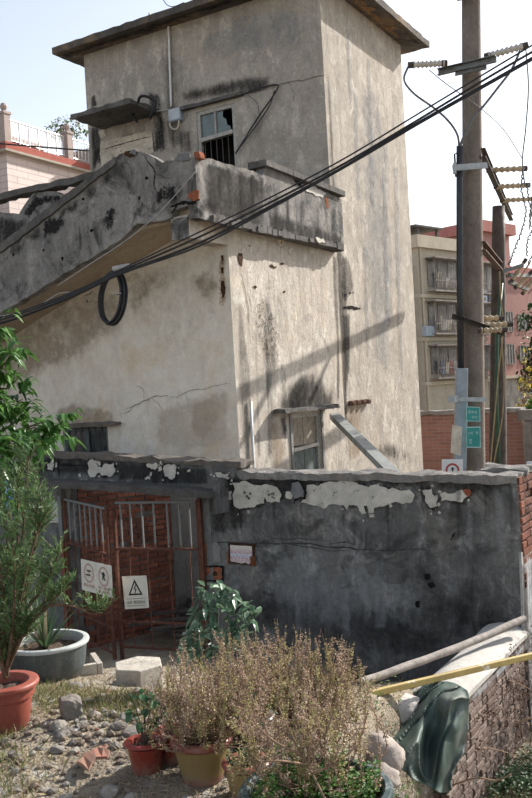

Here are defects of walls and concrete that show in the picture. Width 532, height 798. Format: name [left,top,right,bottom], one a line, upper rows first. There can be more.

leakage [185,79,267,98]
spalling [171,189,200,214]
mould [104,208,115,229]
leakage [207,165,352,417]
crack [126,383,230,413]
peeling [78,459,118,478]
peeling [145,461,191,481]
peeling [210,472,293,515]
peeling [301,481,471,522]